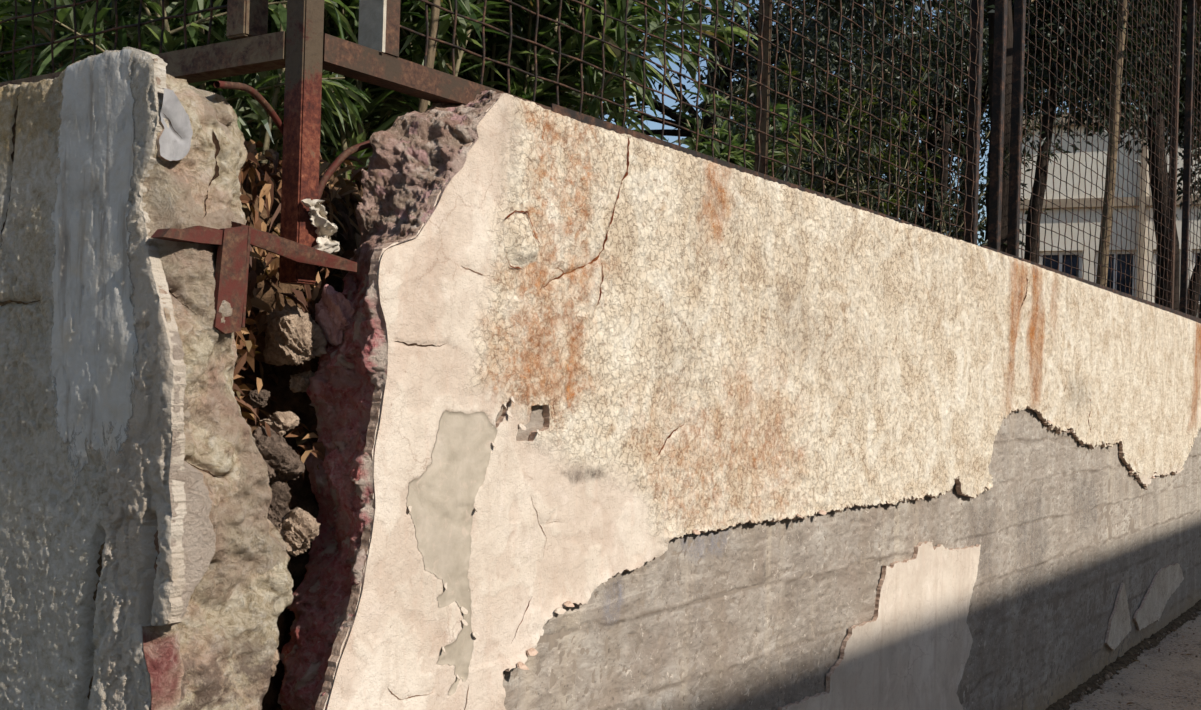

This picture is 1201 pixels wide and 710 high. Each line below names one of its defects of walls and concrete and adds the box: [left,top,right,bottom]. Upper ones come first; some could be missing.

crack [0,87,20,247]
crack [204,118,223,217]
crack [540,137,630,317]
crack [0,299,40,307]
spalling [142,74,294,710]
crack [395,340,444,348]
corrosion [1011,262,1044,398]
corrosion [1192,325,1201,422]
spalling [503,409,1201,710]